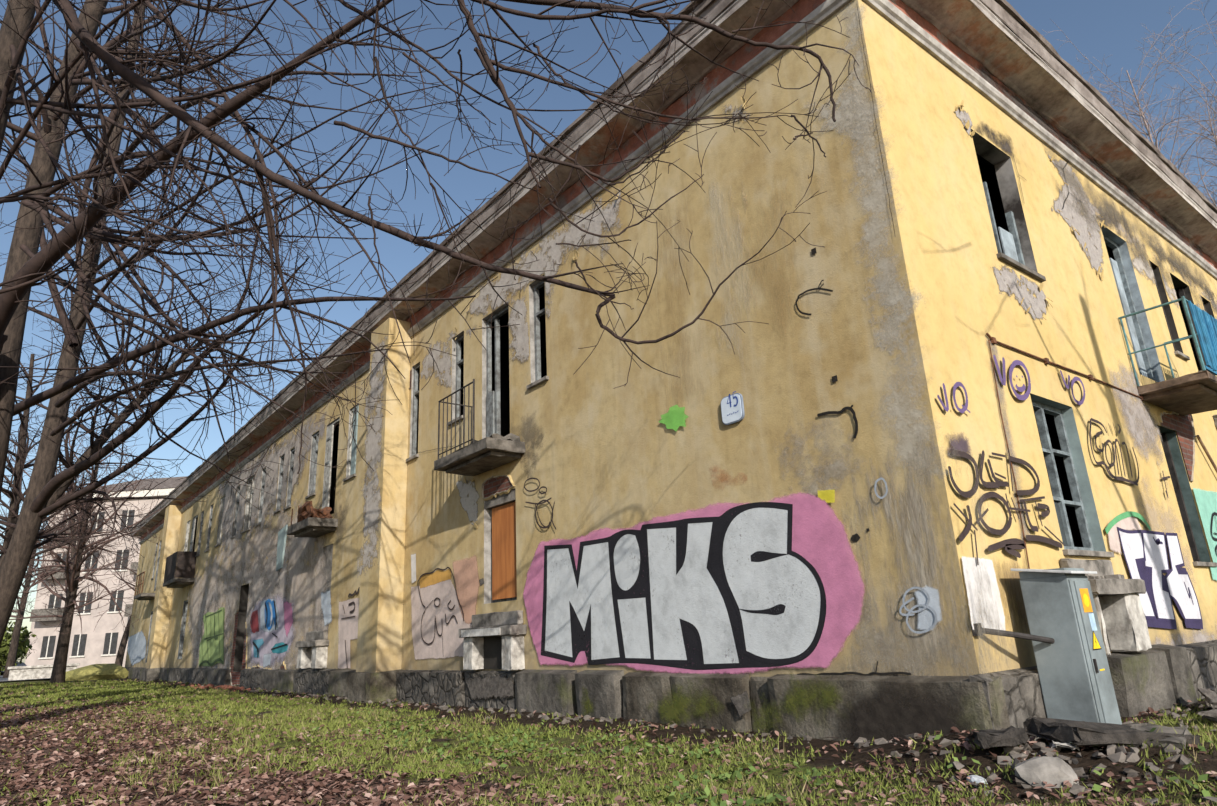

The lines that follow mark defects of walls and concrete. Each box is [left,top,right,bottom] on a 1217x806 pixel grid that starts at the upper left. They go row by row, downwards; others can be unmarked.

peeling [955,100,975,136]
peeling [1048,154,1105,281]
peeling [408,192,621,390]
peeling [992,265,1053,320]
peeling [357,337,387,575]
spalling [456,473,516,528]